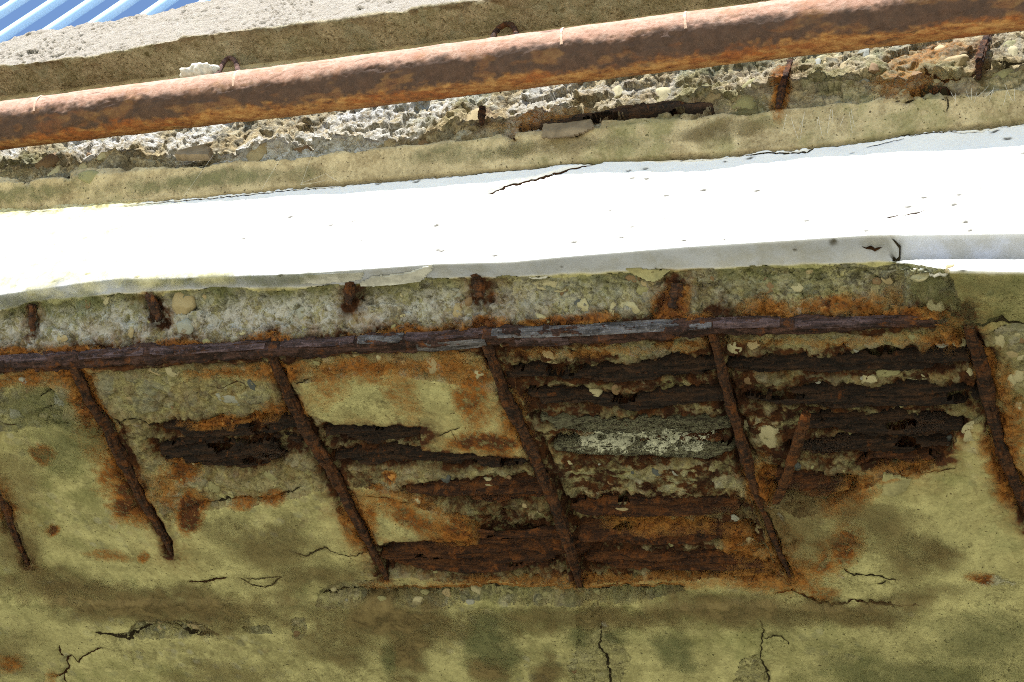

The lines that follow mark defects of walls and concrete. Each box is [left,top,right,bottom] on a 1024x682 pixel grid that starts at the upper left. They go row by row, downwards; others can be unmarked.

spalling [0,31,1024,184]
crack [387,163,593,195]
rust [0,368,305,535]
spalling [0,263,1024,682]
rust [189,295,980,600]
leakage [4,568,261,635]
crack [189,576,281,588]
leakage [234,531,445,682]
leakage [643,590,934,628]
crack [778,569,919,607]
rust [967,574,992,585]
crack [55,621,217,682]